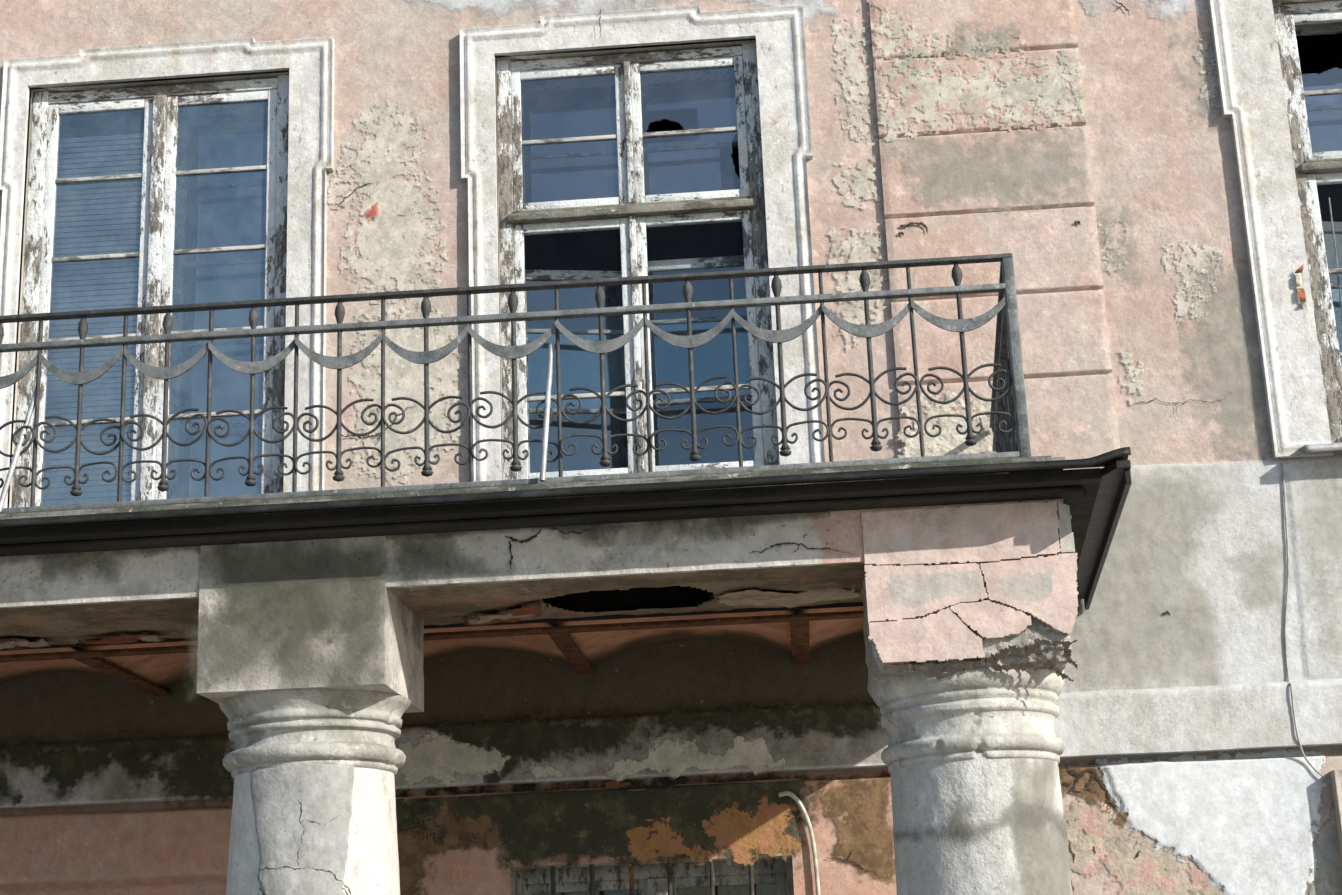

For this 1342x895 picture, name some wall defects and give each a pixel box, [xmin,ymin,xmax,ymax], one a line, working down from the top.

peeling [740,0,1092,210]
peeling [327,100,468,486]
peeling [827,226,887,351]
crack [749,501,1079,664]
water stain [0,730,234,809]
flaking render [250,763,354,895]
crack [257,800,351,895]
flaking render [397,804,500,895]
peeling [397,729,511,789]
water stain [395,698,879,874]
peeling [1059,760,1224,895]
peeling [1308,804,1342,895]